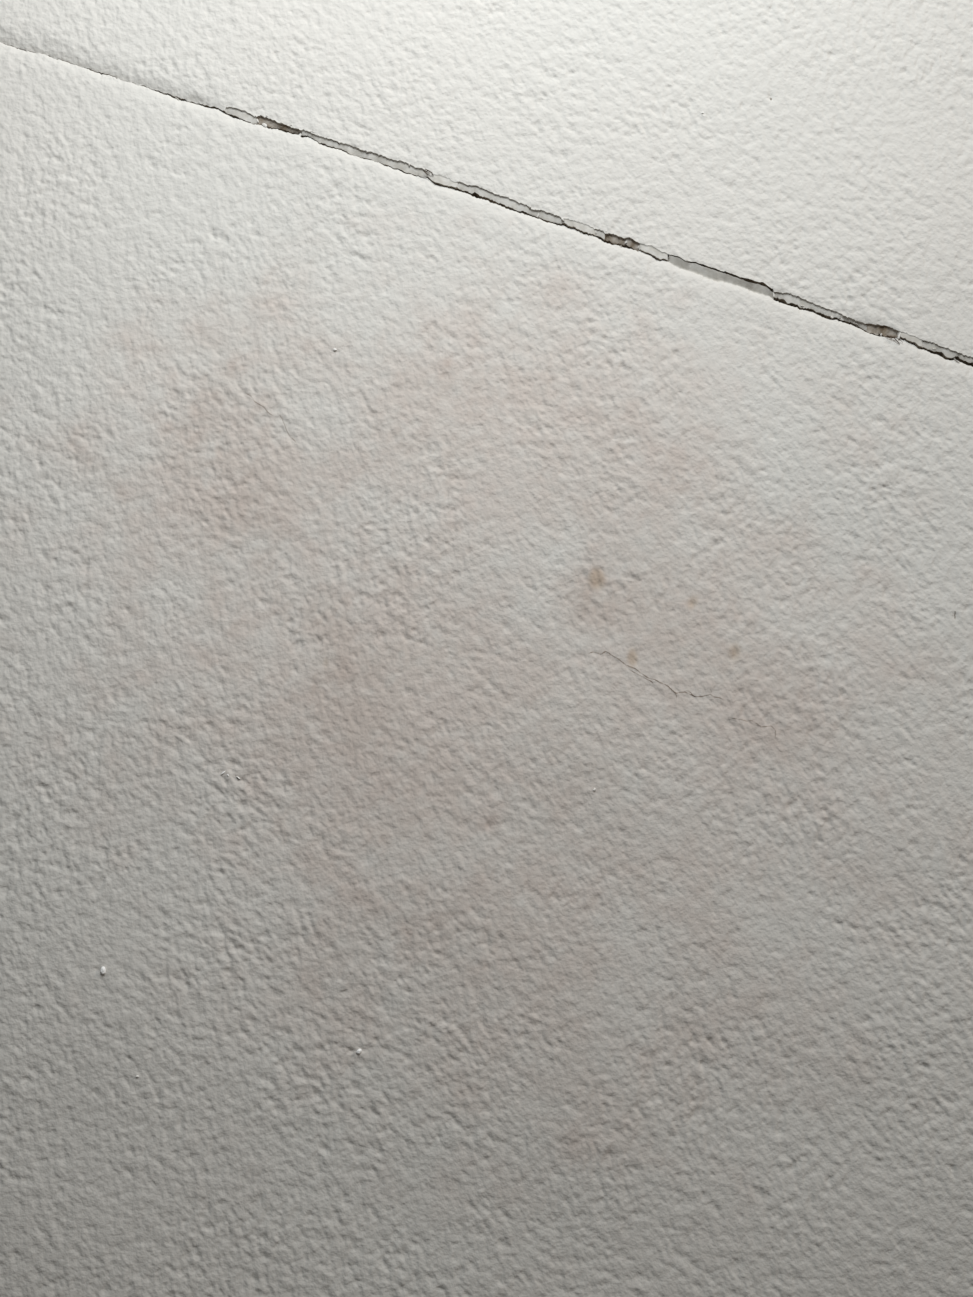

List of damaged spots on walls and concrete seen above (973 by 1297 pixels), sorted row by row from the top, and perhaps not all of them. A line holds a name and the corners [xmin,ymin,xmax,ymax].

crack [3,43,973,367]